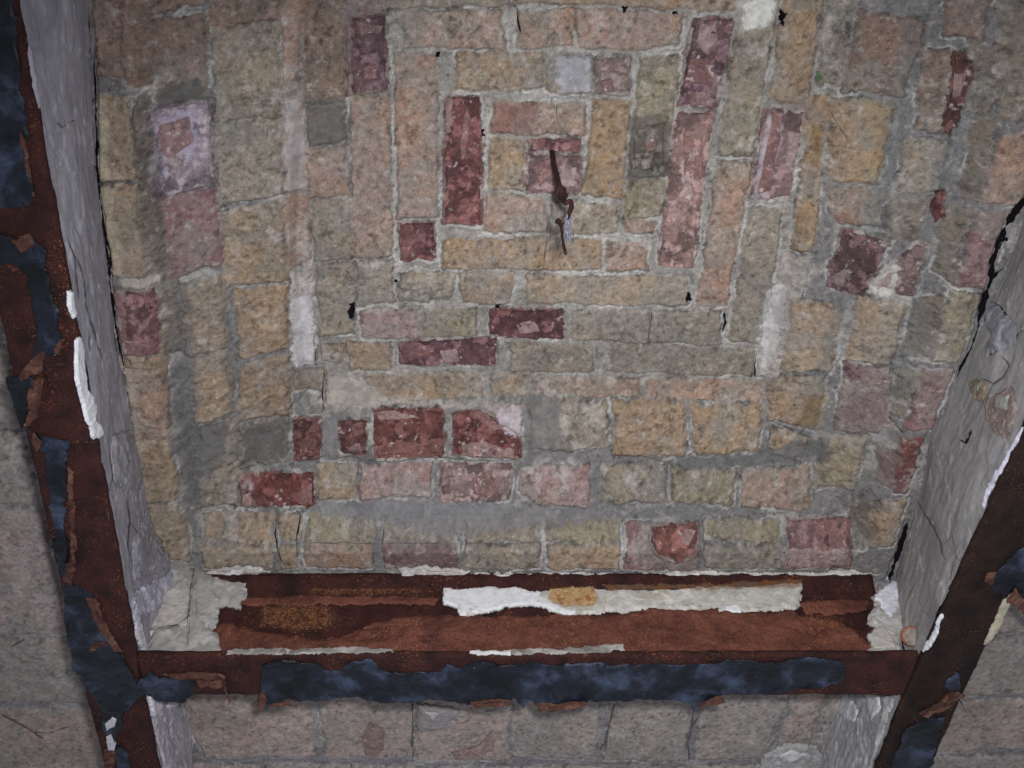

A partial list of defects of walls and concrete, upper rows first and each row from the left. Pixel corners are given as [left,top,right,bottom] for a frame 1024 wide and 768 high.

crack [56,24,124,366]
crack [956,197,1024,399]
peeling [0,233,231,768]
crack [888,502,960,580]
corrosion [260,588,420,633]
corrosion [548,586,597,606]
flaking render [921,613,944,652]
peeling [983,547,1024,645]
peeling [257,657,894,768]
peeling [890,672,965,768]